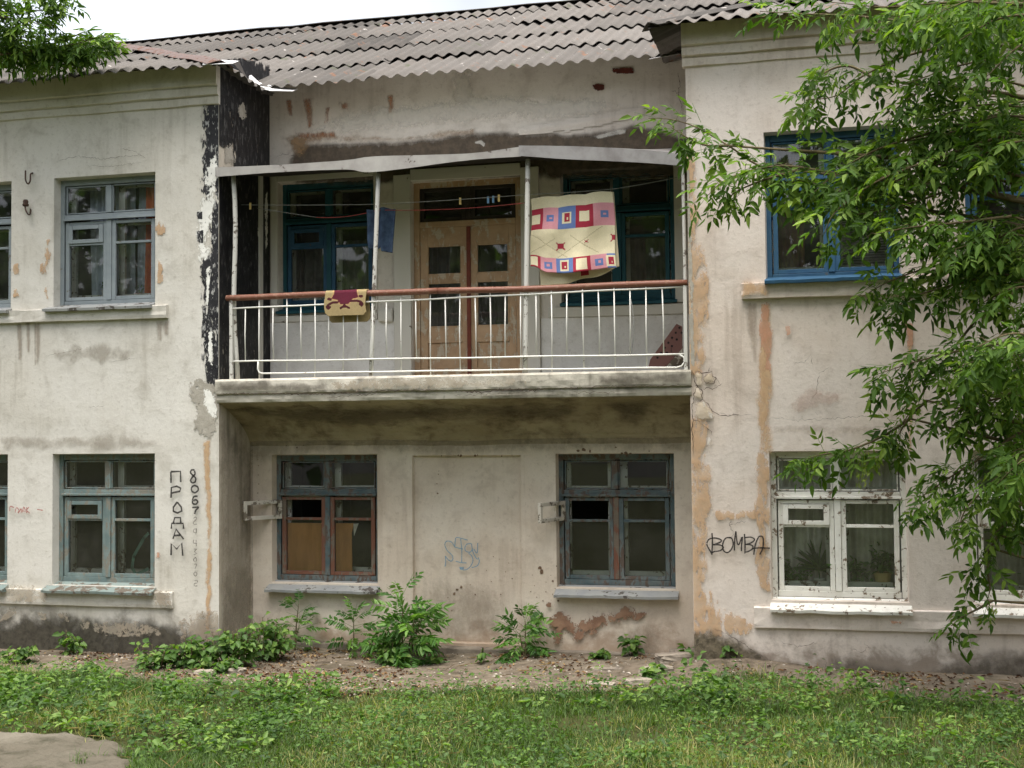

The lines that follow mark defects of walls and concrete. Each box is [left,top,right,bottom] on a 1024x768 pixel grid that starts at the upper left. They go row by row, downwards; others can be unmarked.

damp [290,126,687,185]
peeling [189,58,270,439]
crack [221,370,750,453]
peeling [691,416,770,659]
damp [0,607,189,654]
peeling [530,565,647,644]